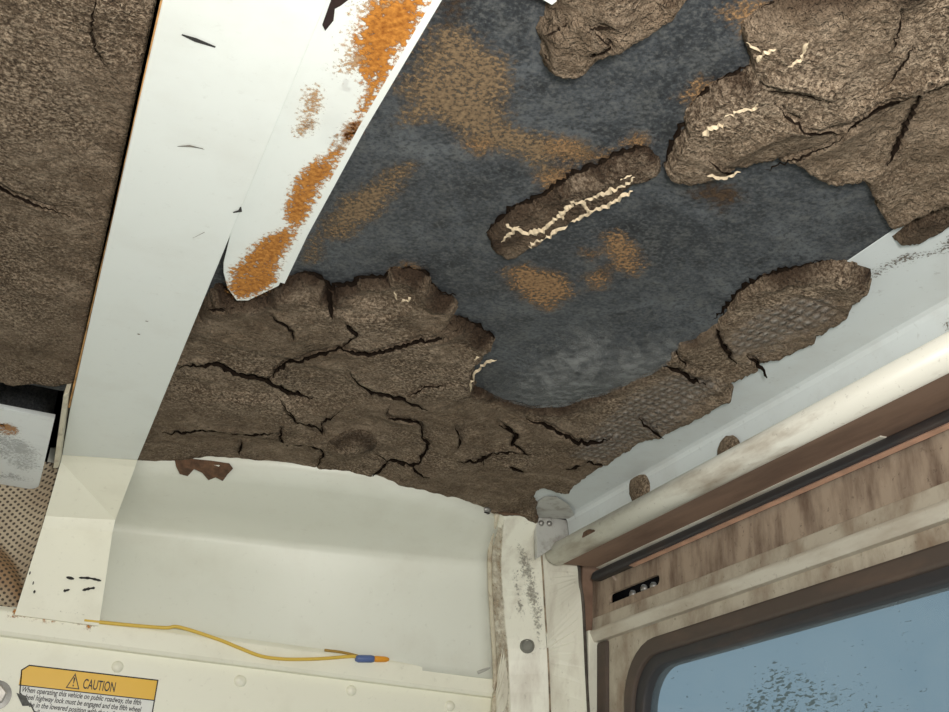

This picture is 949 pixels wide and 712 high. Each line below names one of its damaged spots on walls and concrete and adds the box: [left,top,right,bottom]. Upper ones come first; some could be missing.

peeling [322,0,348,31]
peeling [746,42,776,63]
peeling [702,93,760,137]
crack [758,14,949,171]
rust [227,0,431,299]
crack [0,186,71,217]
peeling [501,175,635,249]
crack [162,287,458,478]
peeling [469,356,496,391]
rust [0,423,19,435]
crack [455,418,610,473]
damp [516,547,542,628]